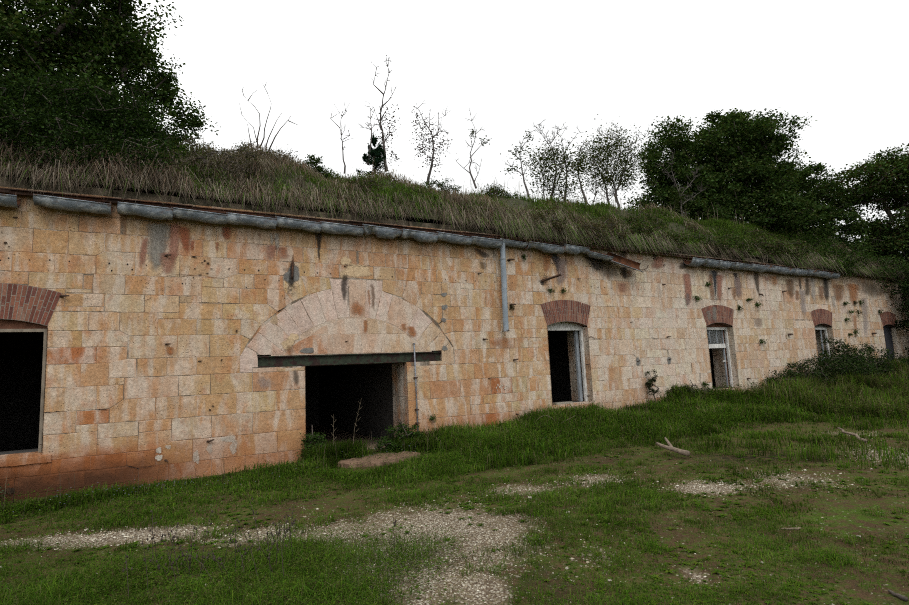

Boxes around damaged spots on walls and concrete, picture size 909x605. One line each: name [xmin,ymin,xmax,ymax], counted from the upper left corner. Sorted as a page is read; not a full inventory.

water stain [140,223,180,273]
water stain [680,263,692,304]
water stain [709,270,722,320]